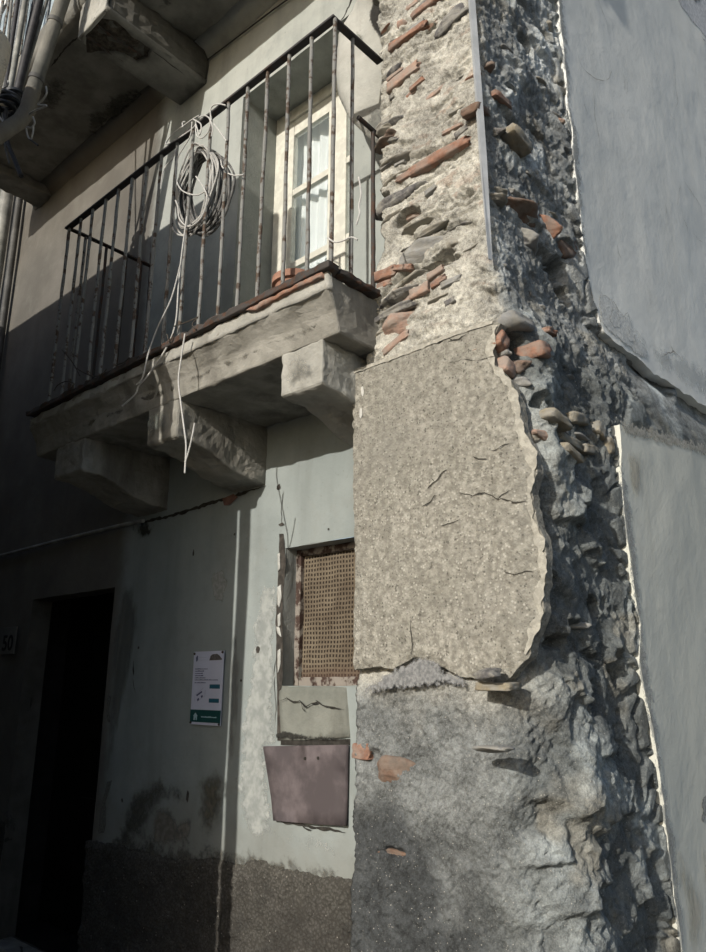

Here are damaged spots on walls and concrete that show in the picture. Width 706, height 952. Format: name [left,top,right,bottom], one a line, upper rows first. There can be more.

crack [462,491,524,504]
spalling [350,0,706,952]
crack [274,661,343,715]
leakage [113,778,310,875]